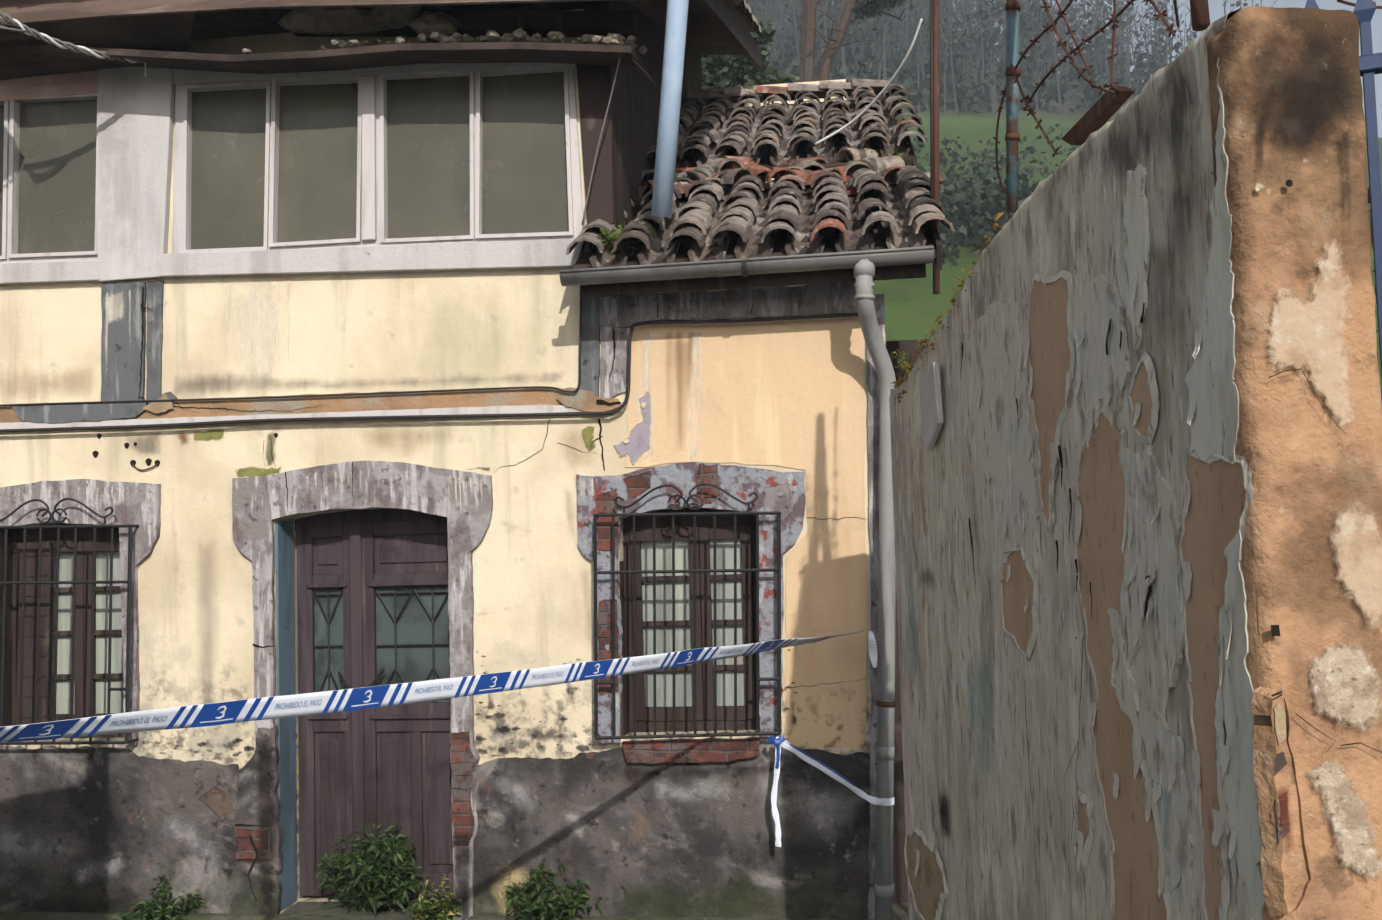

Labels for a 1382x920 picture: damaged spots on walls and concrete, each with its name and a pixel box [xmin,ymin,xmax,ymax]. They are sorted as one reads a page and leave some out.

peeling [595,390,652,551]
peeling [965,58,1311,920]
water stain [475,701,594,757]
water stain [228,738,274,920]
water stain [455,835,470,918]
peeling [904,825,949,920]